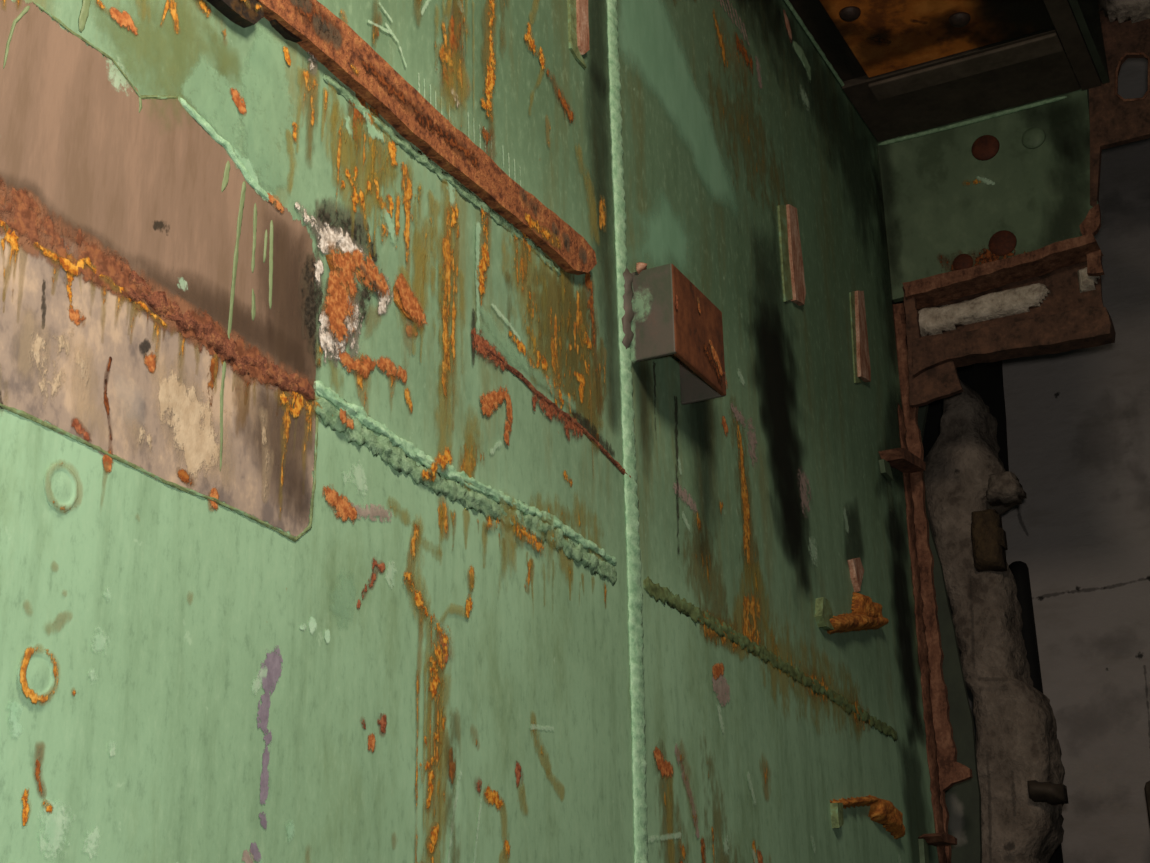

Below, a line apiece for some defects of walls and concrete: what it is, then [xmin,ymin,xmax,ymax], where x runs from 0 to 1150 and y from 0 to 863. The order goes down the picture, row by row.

corrosion [258,0,606,423]
peeling [0,0,394,542]
damp [30,334,61,403]
corrosion [0,178,319,487]
damp [159,370,220,477]
corrosion [332,409,354,429]
corrosion [437,502,455,535]
corrosion [466,567,475,618]
corrosion [478,514,554,591]
corrosion [357,558,456,863]
corrosion [903,472,947,863]
corrosion [476,780,504,811]